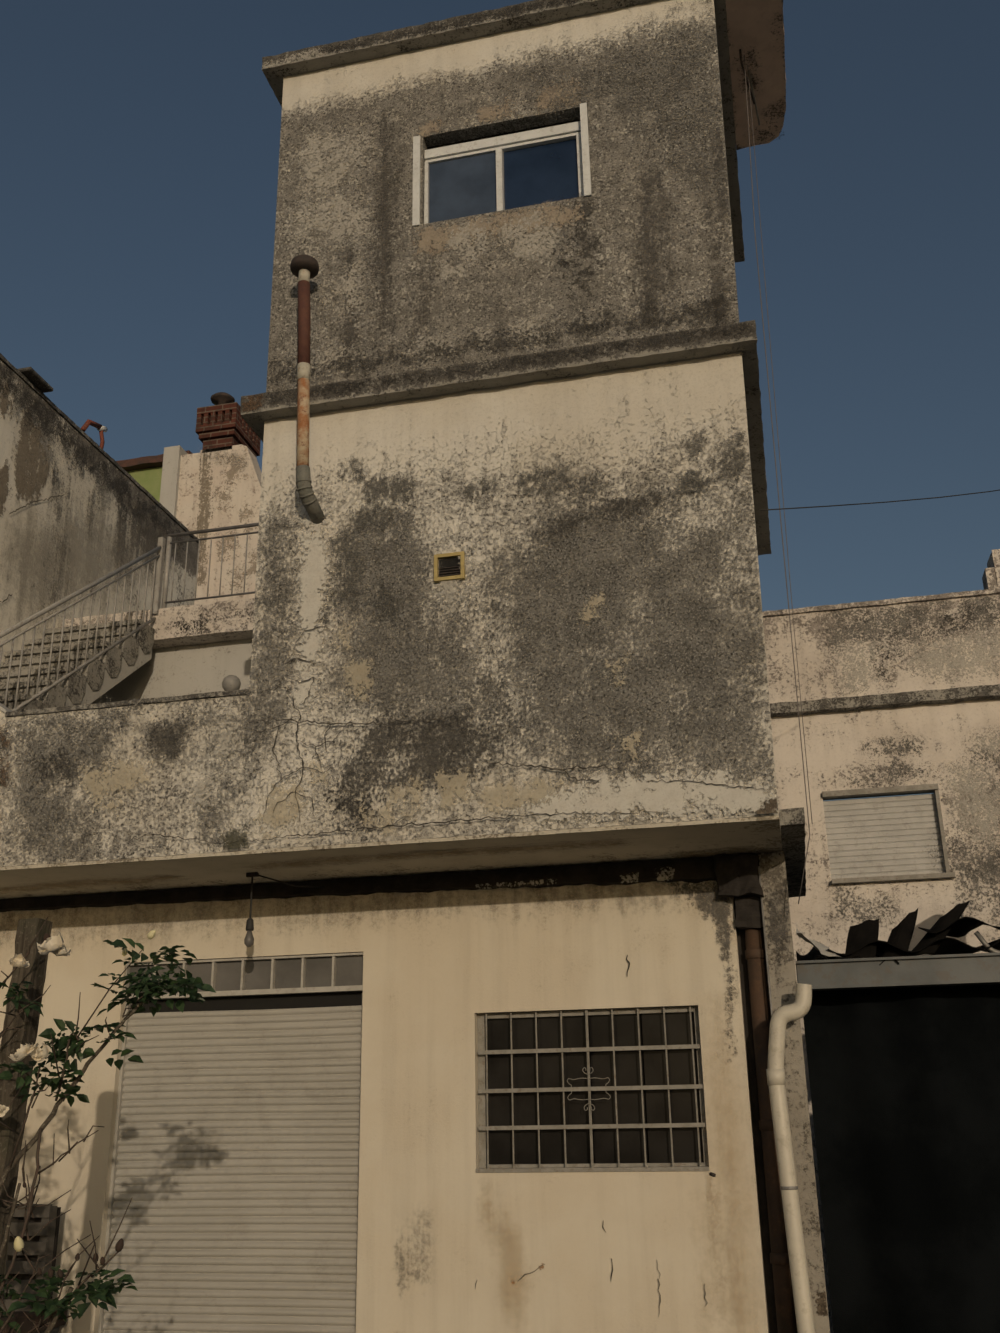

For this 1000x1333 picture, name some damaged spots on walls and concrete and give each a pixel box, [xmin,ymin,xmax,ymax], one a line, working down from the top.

leakage [265,0,753,404]
peeling [0,376,59,516]
leakage [0,429,774,861]
crack [126,626,770,844]
leakage [847,736,934,789]
leakage [824,596,1000,681]